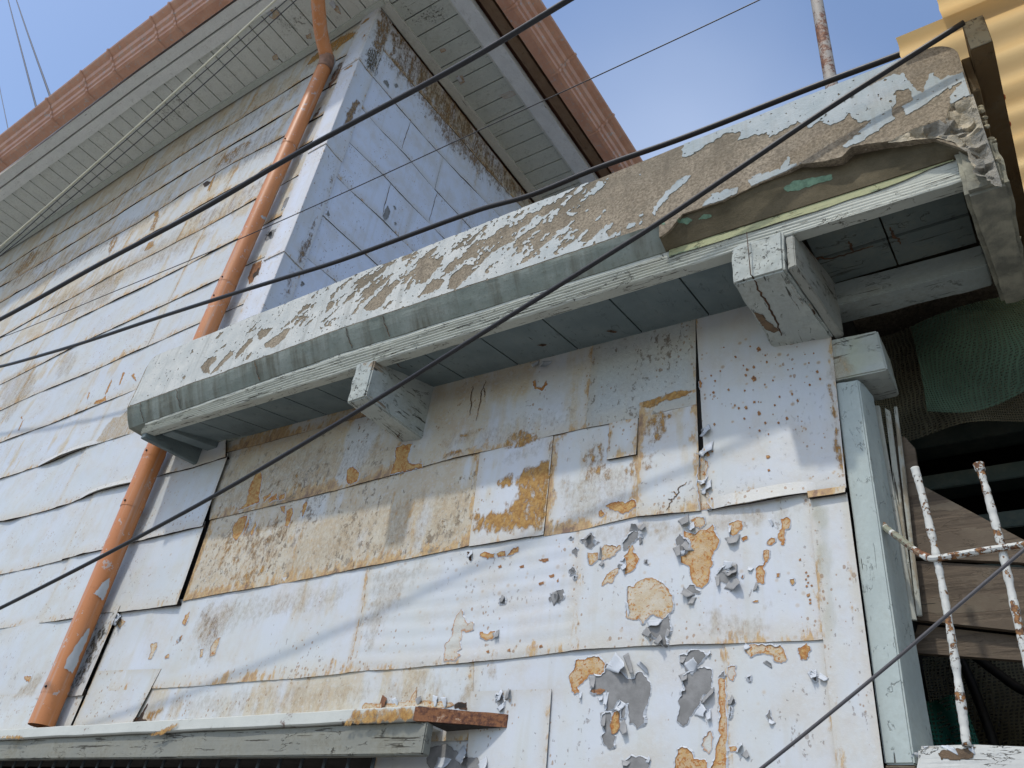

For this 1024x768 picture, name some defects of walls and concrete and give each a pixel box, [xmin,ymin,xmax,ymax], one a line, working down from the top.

peeling [681,58,1002,186]
peeling [129,156,801,406]
crack [746,232,782,336]
crack [470,380,486,419]
rust [643,346,799,443]
rust [219,471,308,581]
rust [346,466,360,485]
rust [470,460,552,533]
rust [834,428,844,469]
peeling [568,424,791,768]
peeling [743,642,829,684]